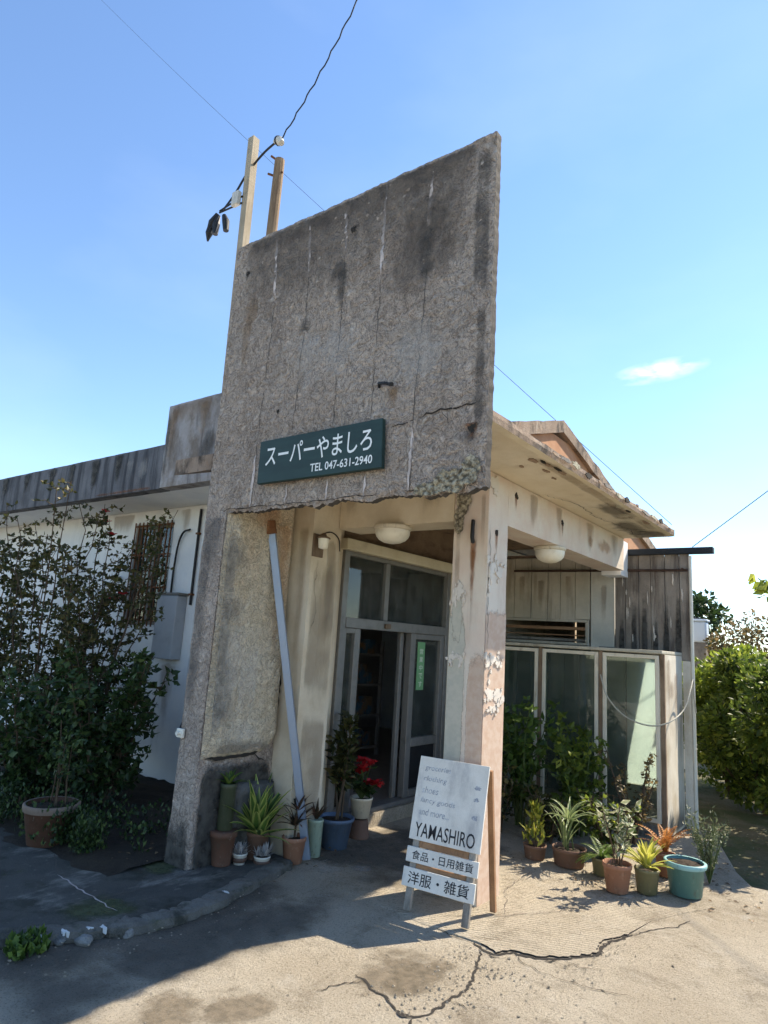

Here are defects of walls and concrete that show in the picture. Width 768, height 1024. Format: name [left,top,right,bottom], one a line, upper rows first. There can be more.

crack [370,171,478,492]
spalling [413,454,481,534]
peeling [449,580,467,607]
peeling [483,651,504,716]
crack [402,935,632,1018]